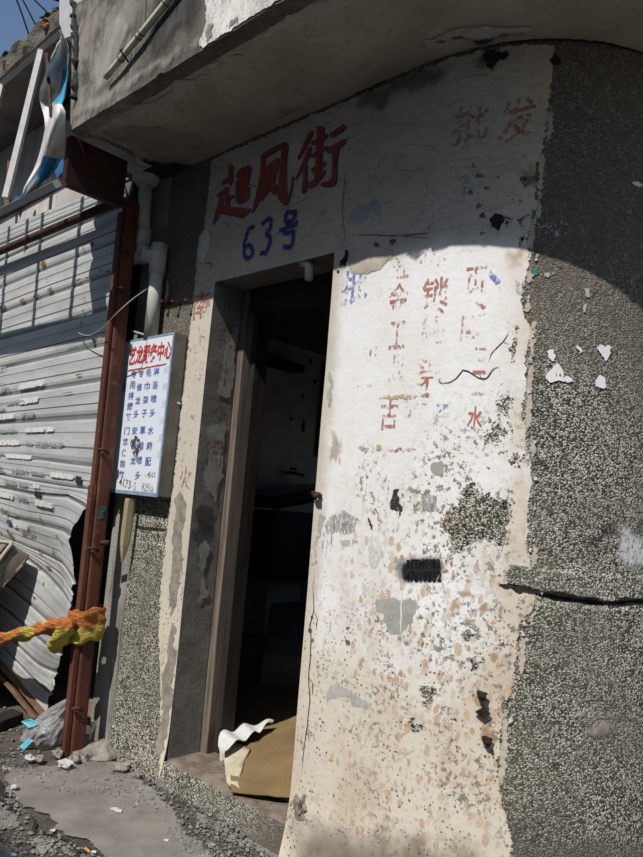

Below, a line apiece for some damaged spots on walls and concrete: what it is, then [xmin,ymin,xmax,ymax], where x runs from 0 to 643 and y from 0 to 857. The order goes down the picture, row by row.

peeling [262,0,347,37]
peeling [94,62,220,133]
peeling [421,467,515,584]
crack [301,571,317,776]